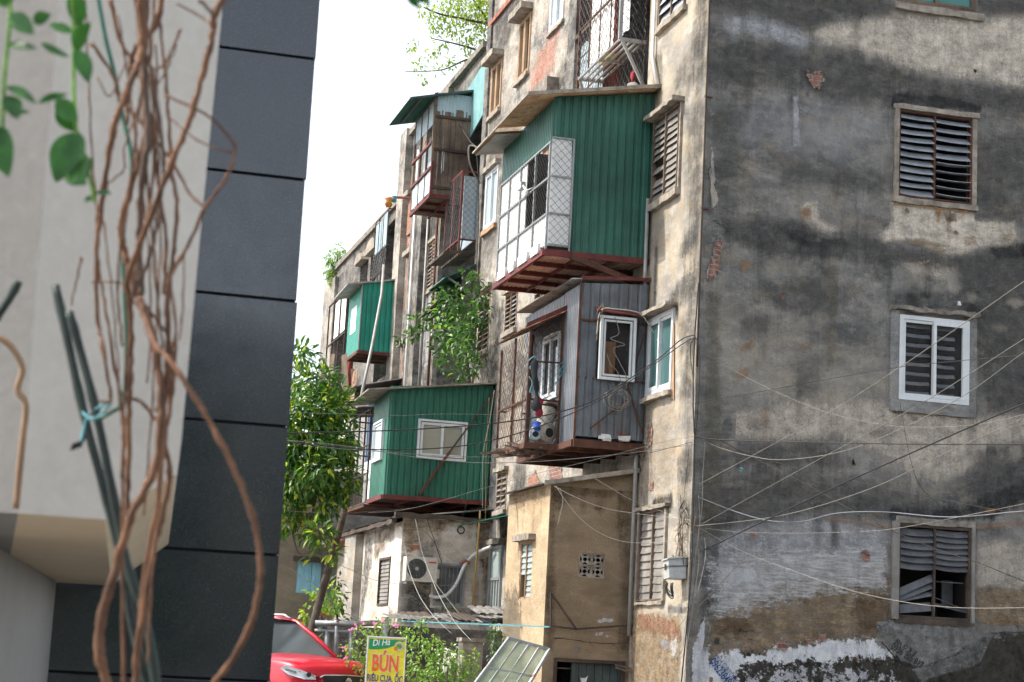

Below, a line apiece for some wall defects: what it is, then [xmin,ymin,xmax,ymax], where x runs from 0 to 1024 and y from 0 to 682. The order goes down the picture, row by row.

leakage [676,0,1024,116]
flaking render [806,16,1024,89]
leakage [728,219,1024,409]
peeling [691,521,900,682]
leakage [704,557,891,656]
leakage [975,587,1024,630]